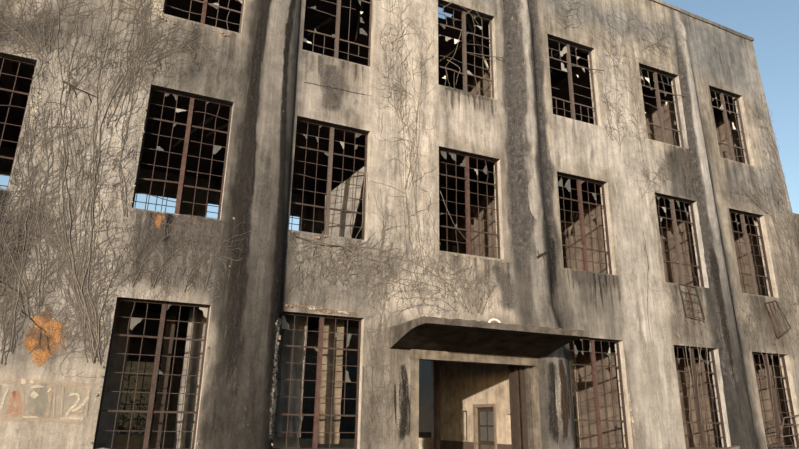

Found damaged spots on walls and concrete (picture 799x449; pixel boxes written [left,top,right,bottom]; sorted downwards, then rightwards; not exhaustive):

leakage [474,0,559,308]
leakage [134,210,225,268]
leakage [222,0,271,394]
leakage [267,0,295,408]
leakage [567,269,621,309]
corrosion [25,306,62,366]
spalling [270,318,281,446]
leakage [394,364,410,441]
leakage [546,362,562,444]